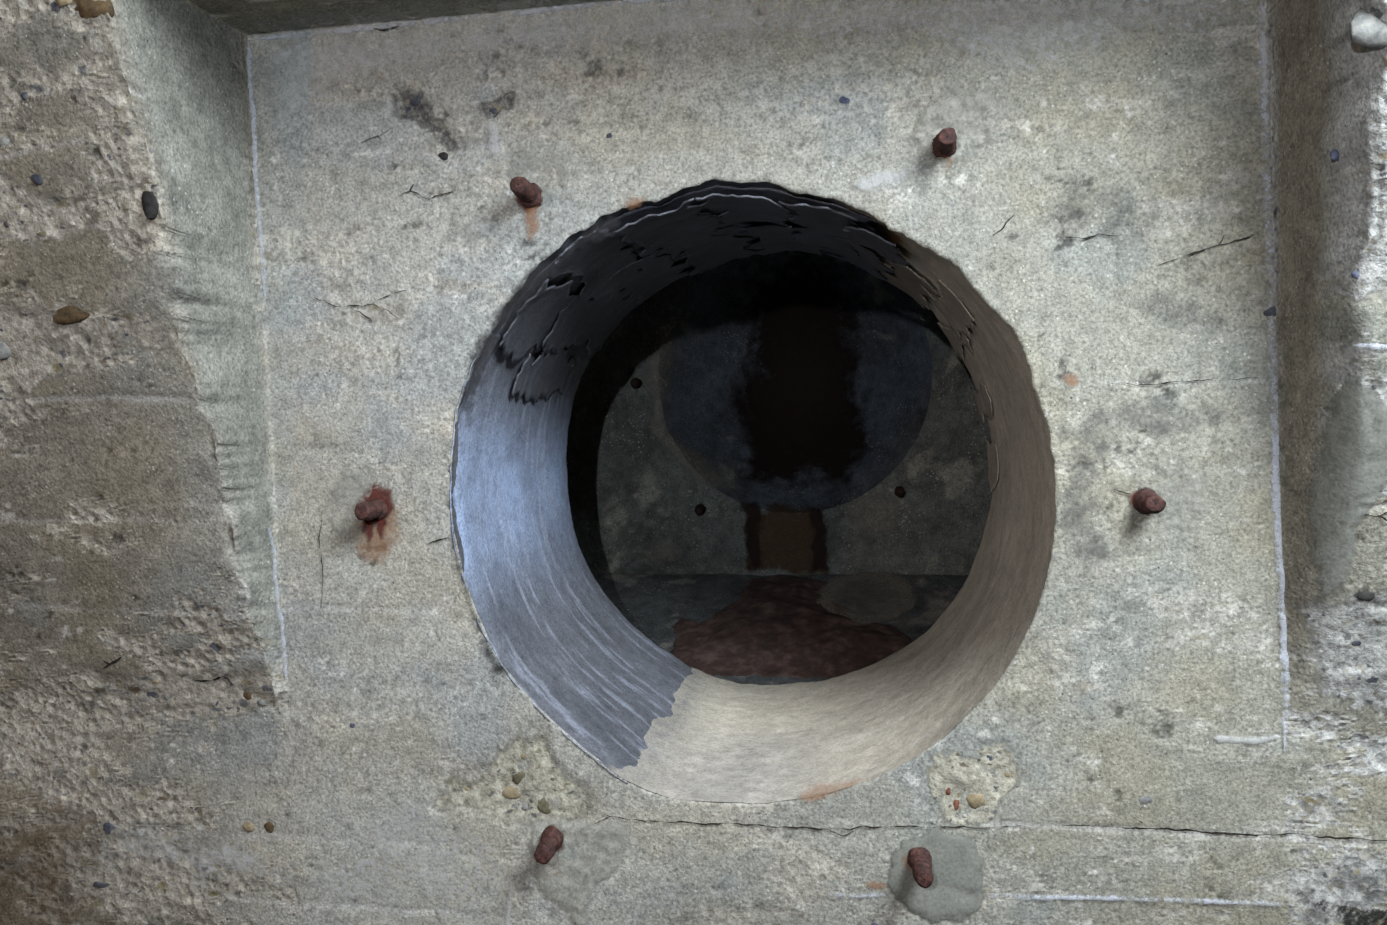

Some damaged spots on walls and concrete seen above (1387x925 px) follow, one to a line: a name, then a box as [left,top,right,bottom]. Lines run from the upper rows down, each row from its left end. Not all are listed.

corrosion [931,134,957,160]
corrosion [516,183,543,212]
corrosion [359,485,394,541]
corrosion [1131,487,1158,515]
corrosion [540,824,564,851]
crack [588,807,1387,841]
corrosion [907,847,932,868]